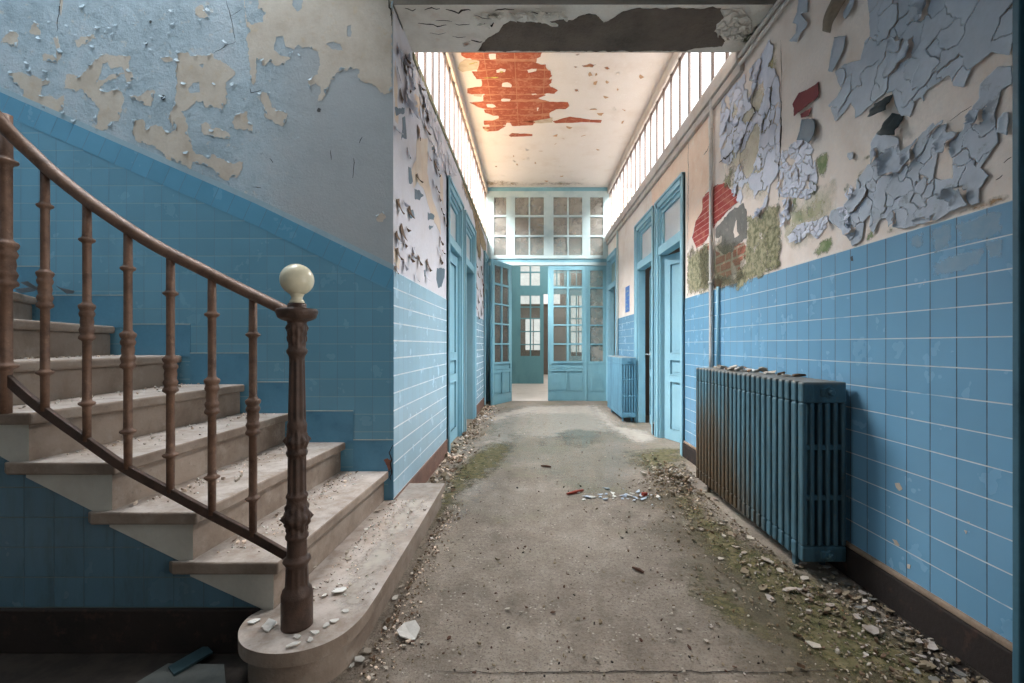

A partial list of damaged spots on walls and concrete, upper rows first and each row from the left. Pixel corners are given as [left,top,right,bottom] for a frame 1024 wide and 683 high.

flaking render [7,50,253,186]
flaking render [244,0,457,288]
spalling [458,6,758,183]
peeling [651,0,1012,271]